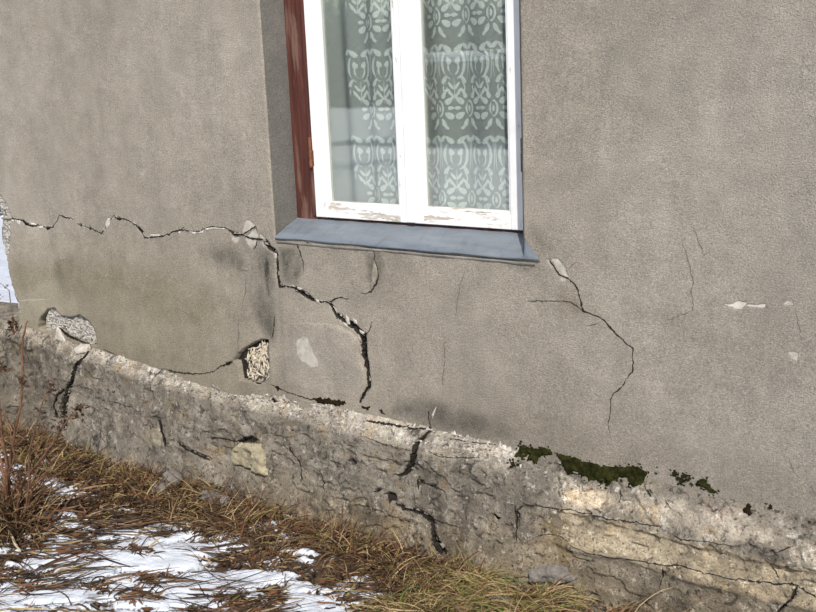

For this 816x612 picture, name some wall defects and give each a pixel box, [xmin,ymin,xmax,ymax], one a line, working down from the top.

peeling [714,301,765,310]
flaking render [46,308,220,394]
flaking render [216,339,270,382]
crack [10,215,496,552]
crack [533,260,634,438]
spalling [231,394,519,464]
crack [507,487,816,612]